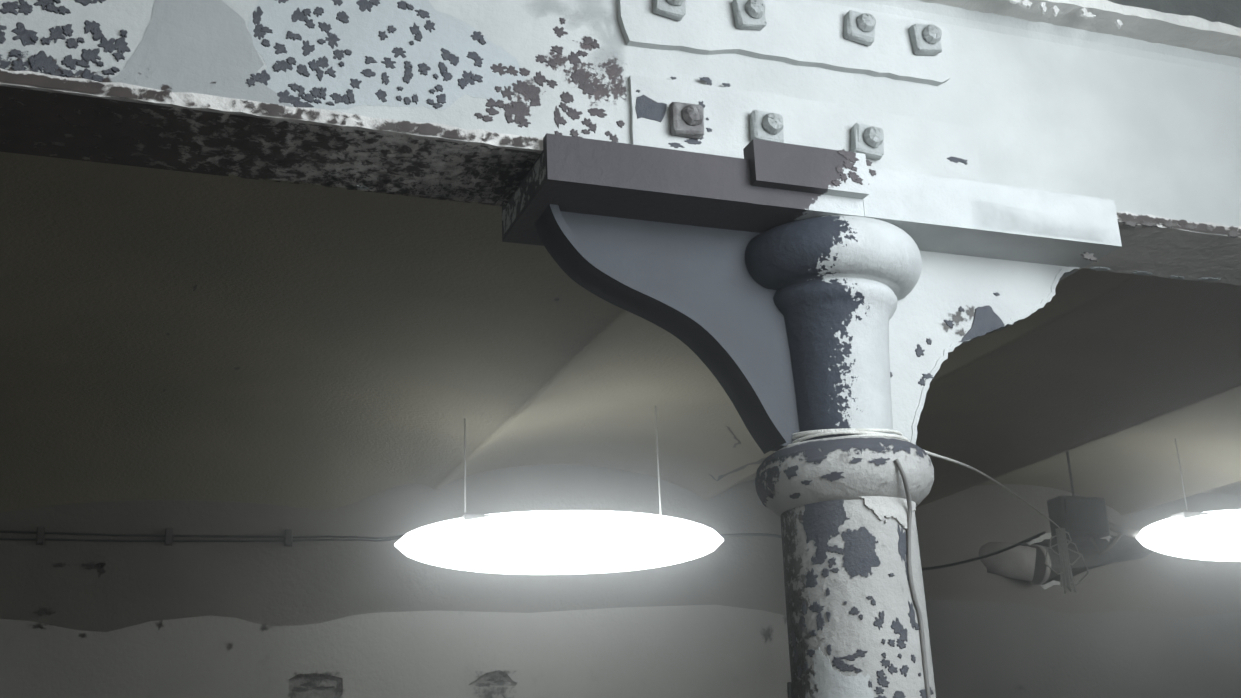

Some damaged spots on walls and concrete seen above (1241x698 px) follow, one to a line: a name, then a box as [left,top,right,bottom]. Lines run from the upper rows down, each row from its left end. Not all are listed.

peeling [0,0,527,111]
peeling [1117,212,1241,238]
spalling [942,292,1005,342]
spalling [915,338,932,357]
peeling [755,437,934,698]
spalling [288,672,343,698]
spalling [469,670,517,698]